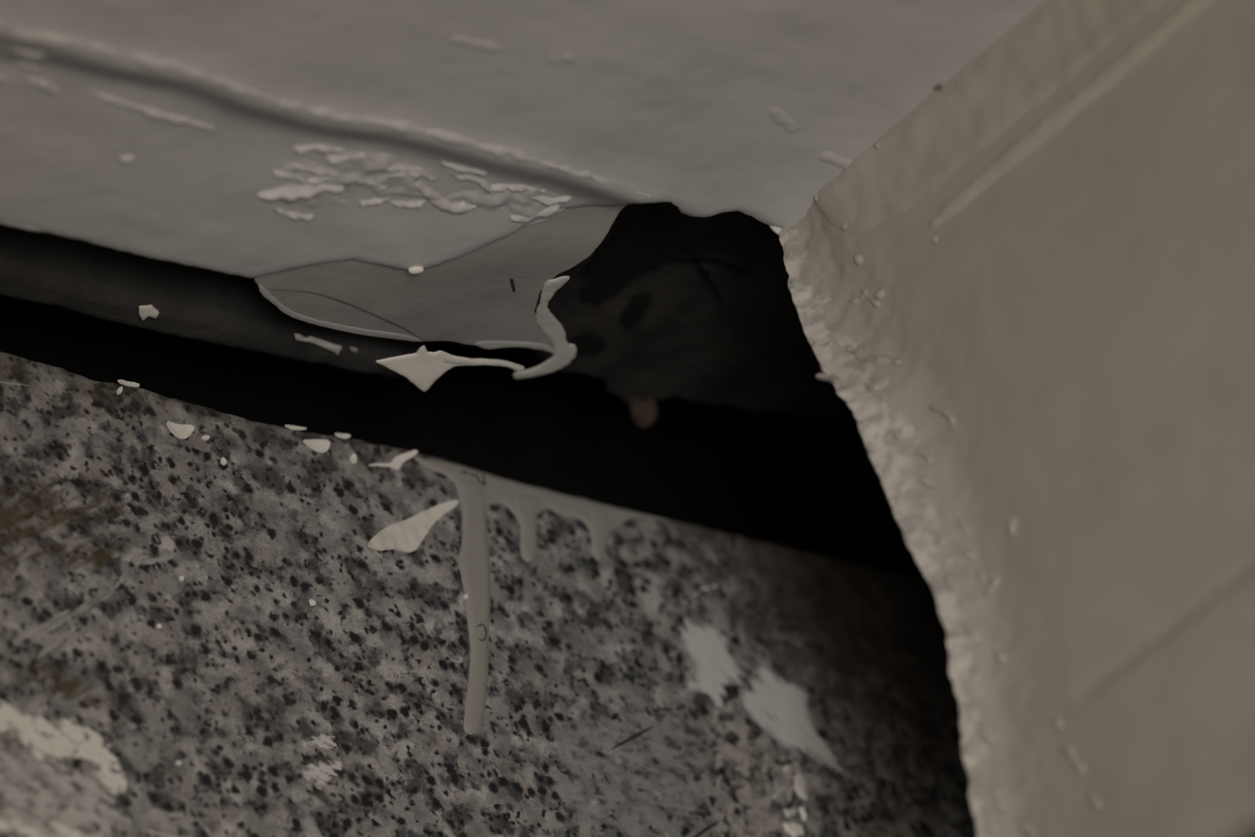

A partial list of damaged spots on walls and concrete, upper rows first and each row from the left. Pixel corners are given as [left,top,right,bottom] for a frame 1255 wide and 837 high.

peeling [254,144,628,392]